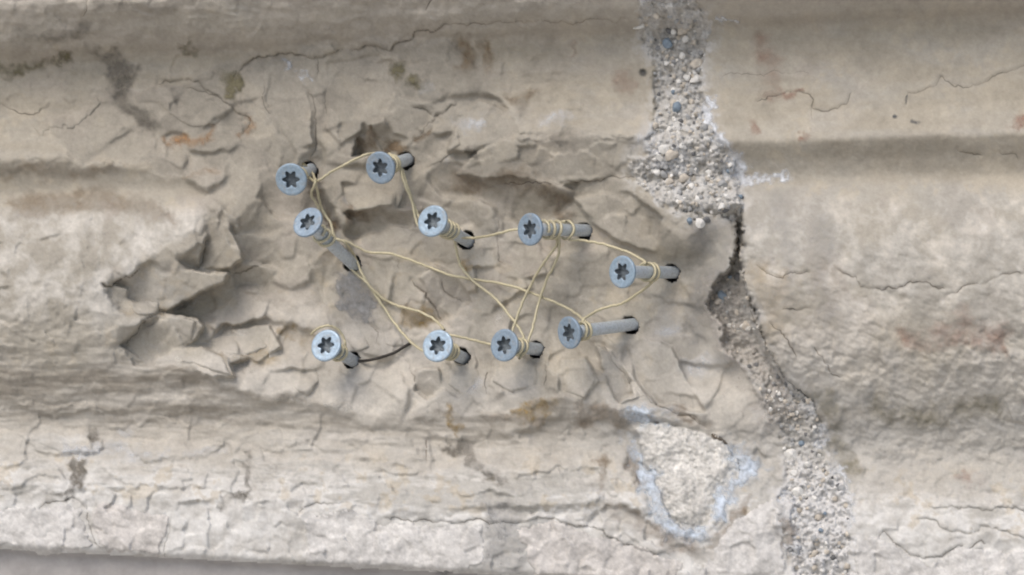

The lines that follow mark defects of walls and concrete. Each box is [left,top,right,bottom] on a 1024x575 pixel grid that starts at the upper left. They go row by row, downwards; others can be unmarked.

spalling [34,35,769,434]